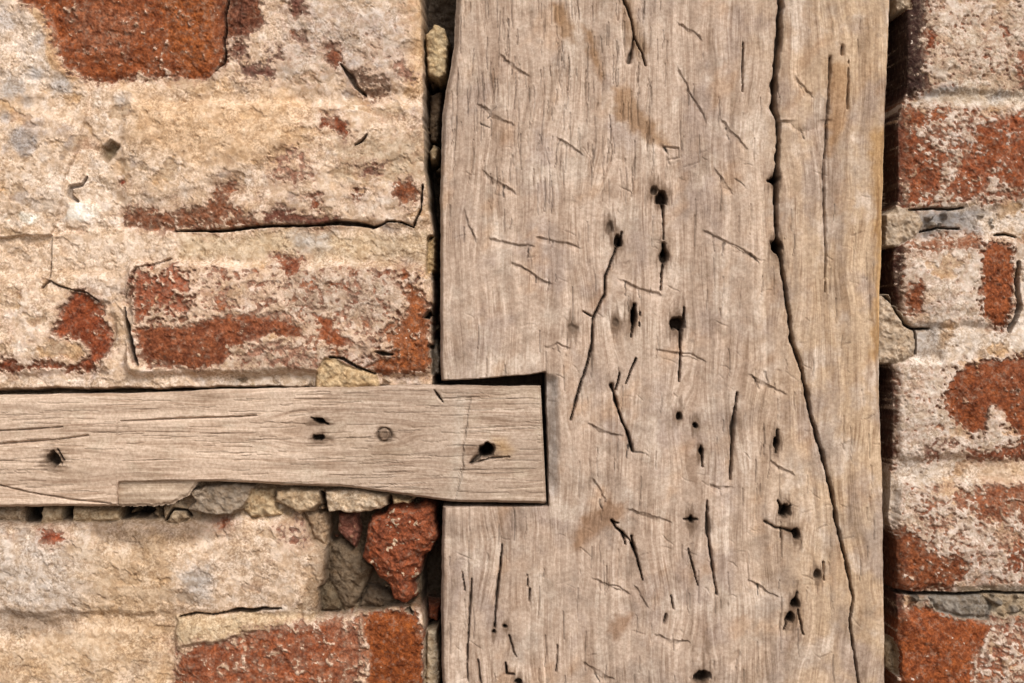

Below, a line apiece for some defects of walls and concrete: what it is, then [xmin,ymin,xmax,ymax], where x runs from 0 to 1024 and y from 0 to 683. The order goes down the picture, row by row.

crack [342,66,367,97]
crack [182,187,424,233]
crack [910,207,964,233]
crack [43,281,100,303]
crack [126,259,172,365]
crack [879,295,930,355]
crack [179,606,282,619]
peeling [173,498,442,683]